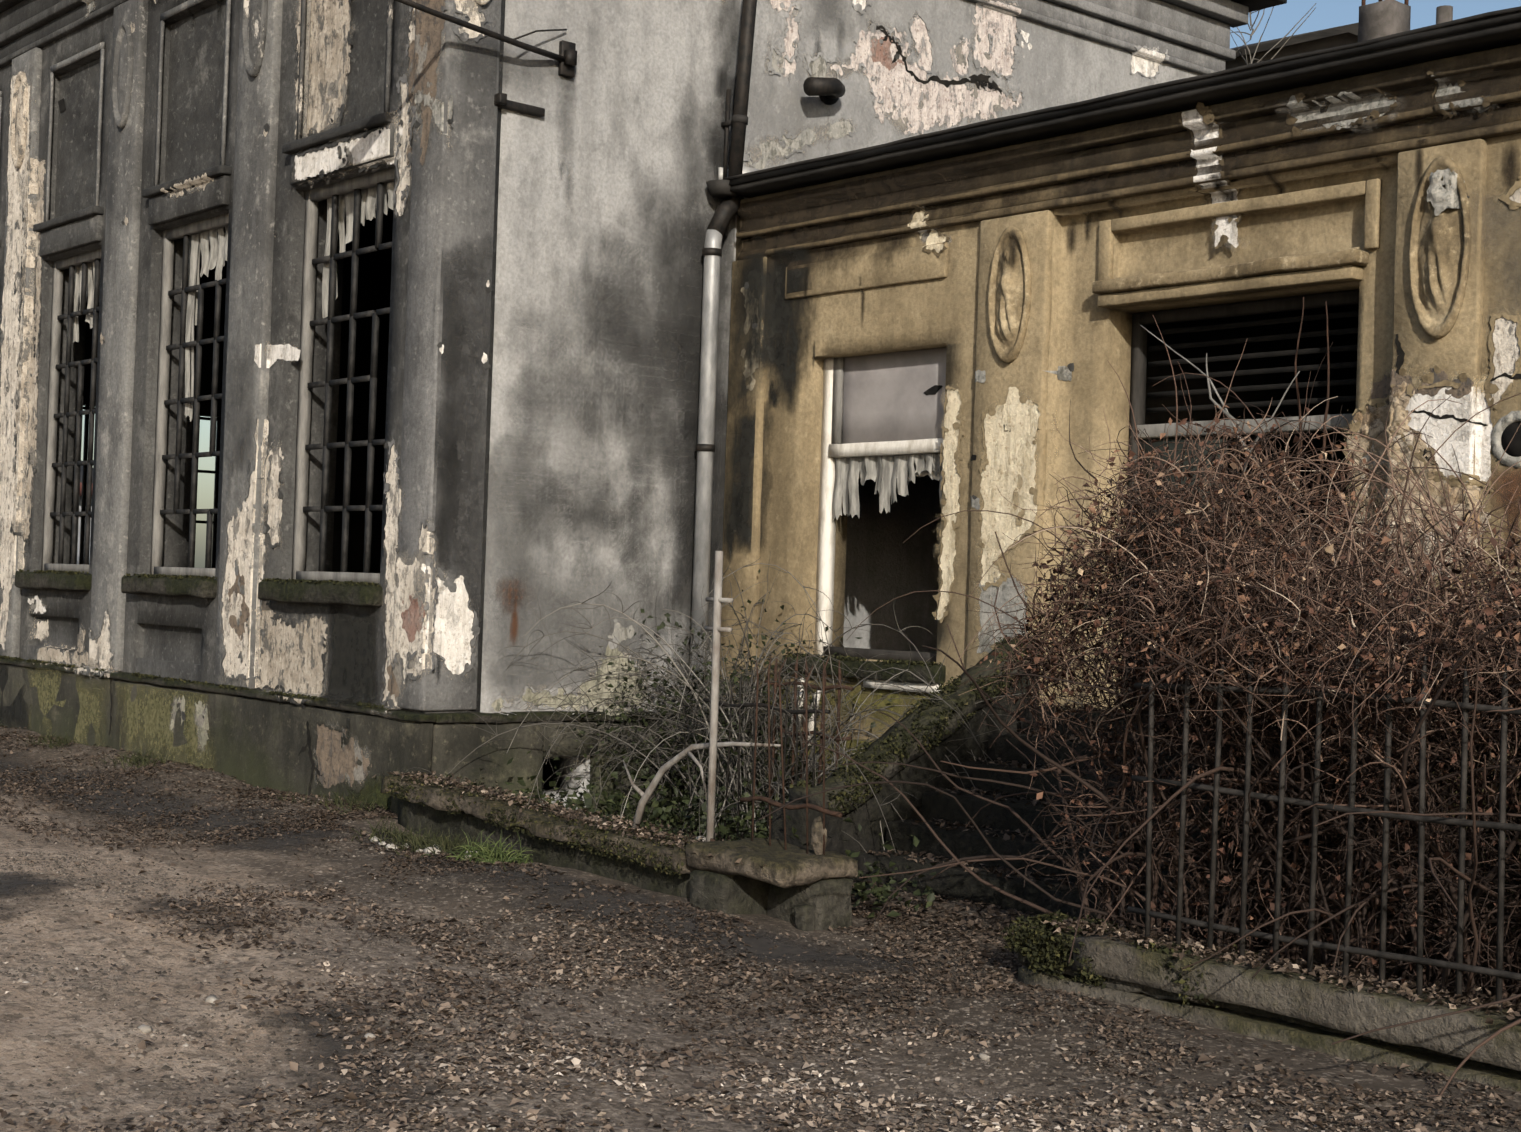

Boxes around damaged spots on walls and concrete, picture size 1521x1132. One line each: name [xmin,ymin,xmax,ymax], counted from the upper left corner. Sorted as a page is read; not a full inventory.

peeling [292,0,488,216]
peeling [765,0,1032,137]
crack [870,24,1002,95]
water stain [0,664,31,729]
peeling [0,74,121,679]
peeling [219,415,331,708]
peeling [377,439,480,713]
water stain [723,139,1064,558]
peeling [932,383,1058,654]
spalling [1340,313,1521,583]
crack [1395,334,1488,477]
crack [1491,373,1521,381]